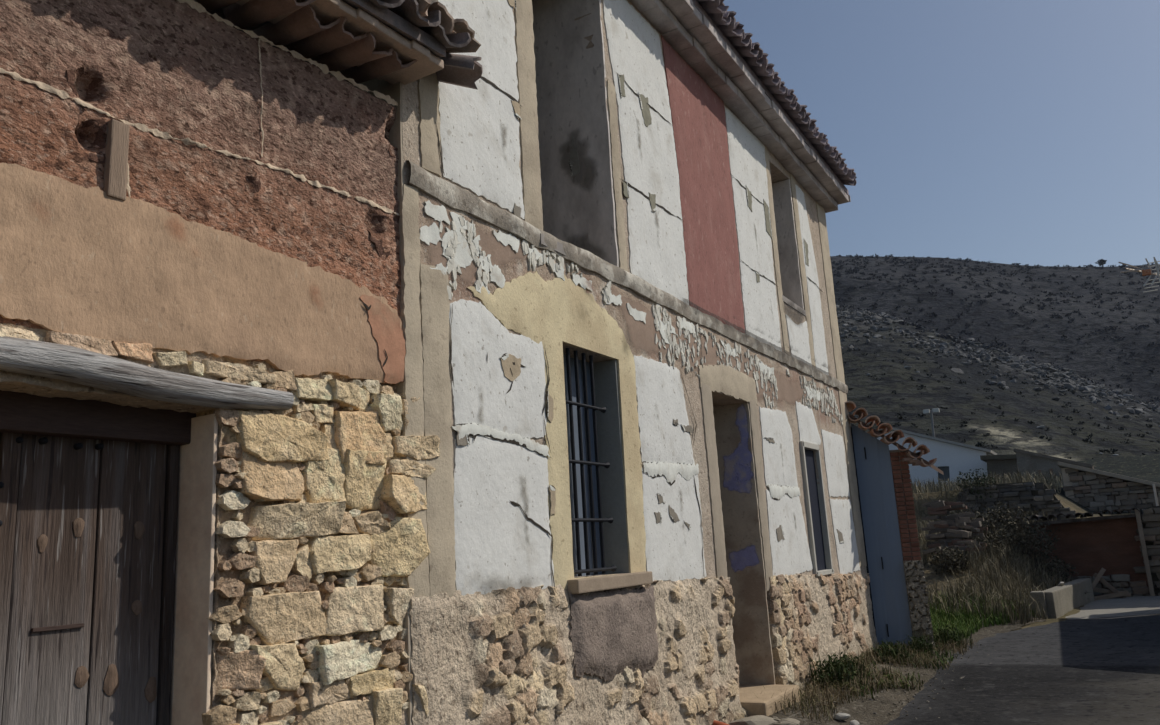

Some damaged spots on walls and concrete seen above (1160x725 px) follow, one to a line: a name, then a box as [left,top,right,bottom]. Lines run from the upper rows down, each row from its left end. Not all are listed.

spalling [365,215,400,259]
peeling [360,295,406,384]
peeling [419,200,843,426]
peeling [451,422,550,458]
peeling [723,405,753,493]
peeling [768,484,801,500]
crack [509,500,555,587]